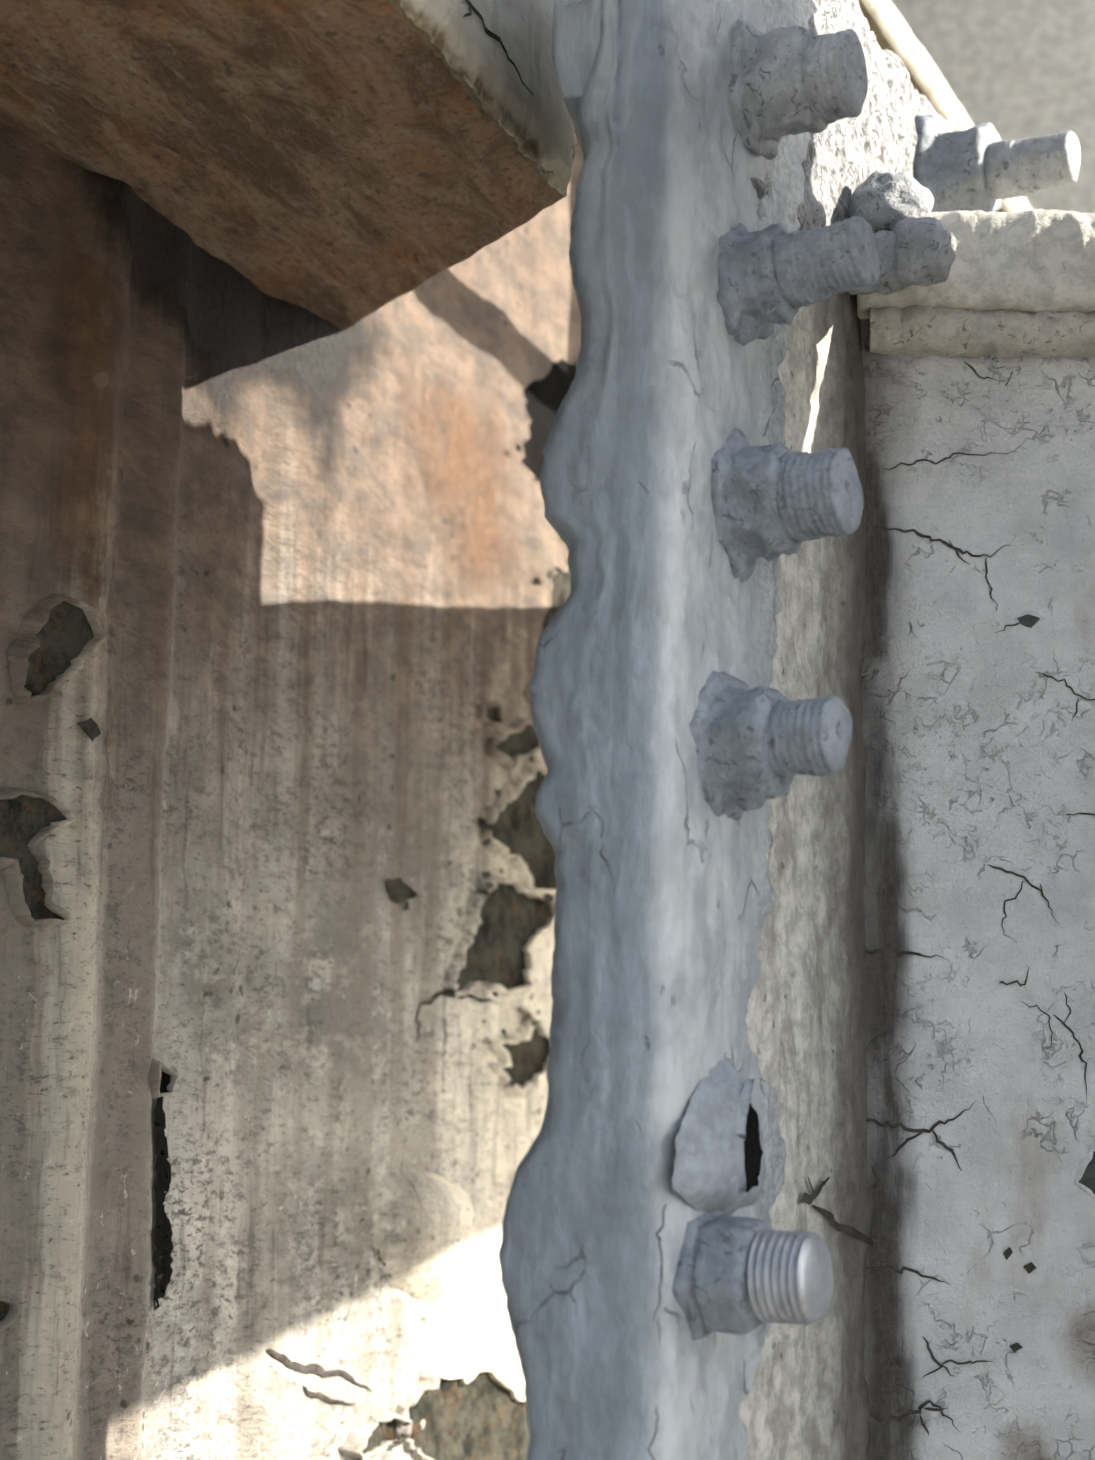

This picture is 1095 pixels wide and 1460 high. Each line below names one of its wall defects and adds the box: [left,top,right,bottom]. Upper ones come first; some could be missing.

peeling [516,355,577,485]
peeling [540,540,571,633]
crack [888,528,1031,633]
peeling [7,593,107,705]
peeling [0,788,77,928]
peeling [440,683,557,1097]
crack [987,864,1087,1100]
crack [866,1101,976,1171]
crack [153,1092,173,1310]
crack [800,1177,949,1284]
peeling [338,1364,529,1460]
crack [870,1336,995,1436]